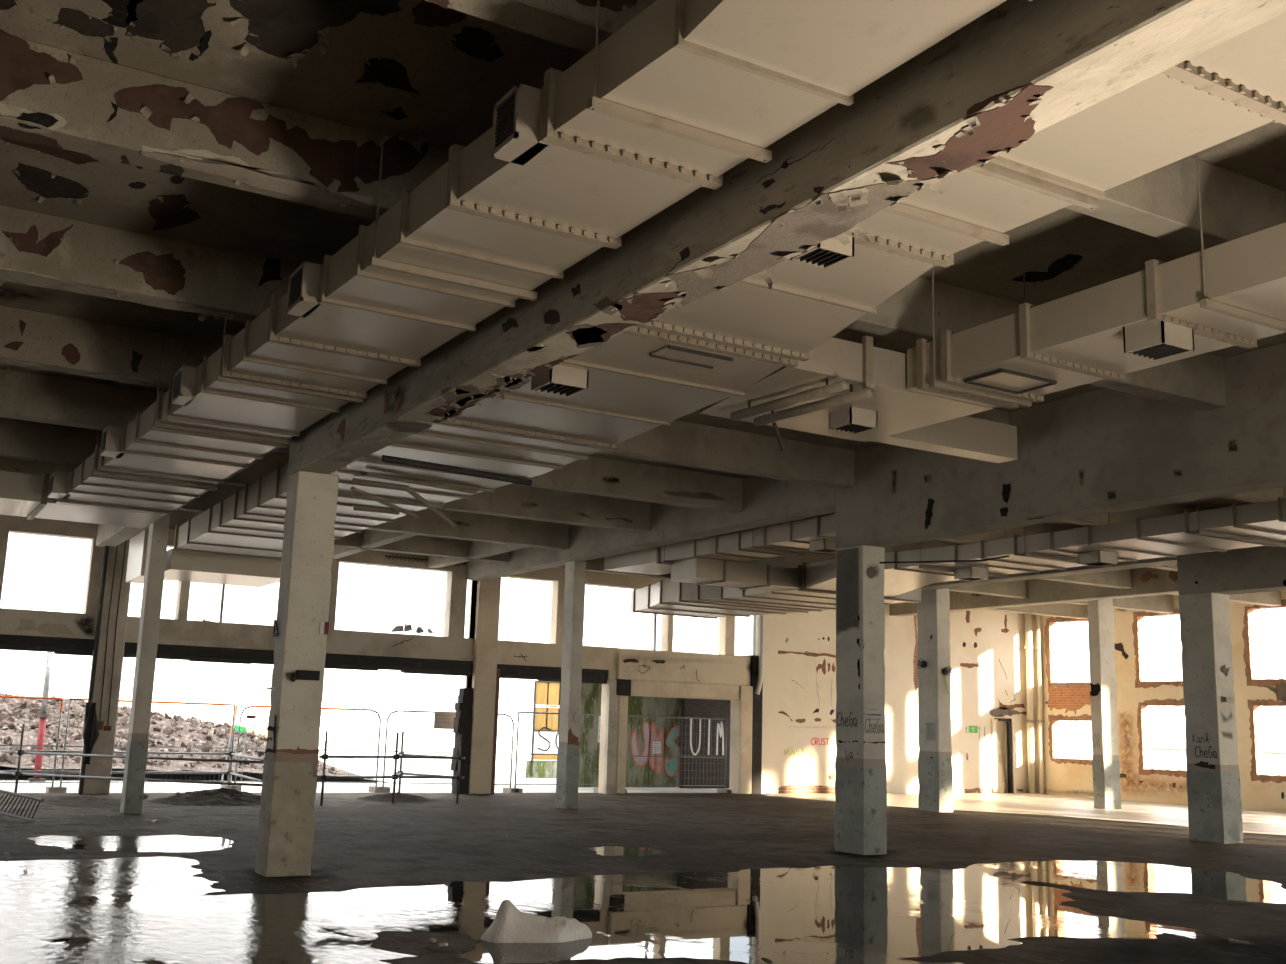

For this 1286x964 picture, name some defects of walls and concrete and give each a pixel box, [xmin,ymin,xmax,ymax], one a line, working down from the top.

peeling [0,0,18,10]
peeling [576,0,637,12]
peeling [355,57,420,98]
peeling [0,29,100,206]
peeling [114,84,429,231]
peeling [2,224,73,257]
flaking render [0,249,235,321]
spalling [384,84,1054,434]
spalling [925,498,935,530]
flaking render [1044,617,1101,765]